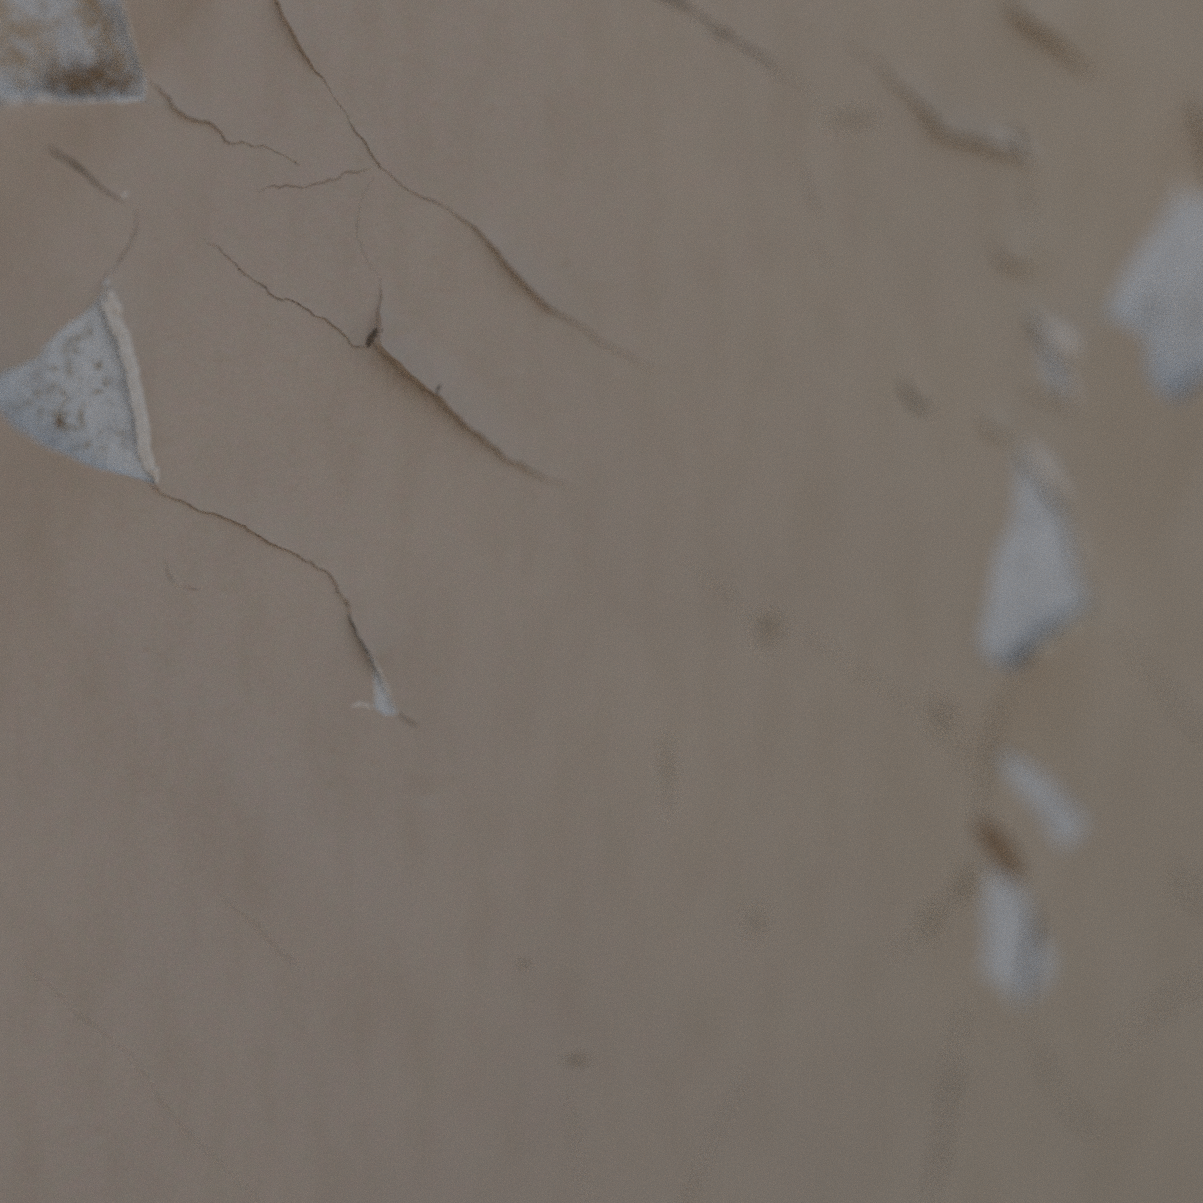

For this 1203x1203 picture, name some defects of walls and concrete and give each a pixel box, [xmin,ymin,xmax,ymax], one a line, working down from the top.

peeling [0,0,220,297]
crack [147,72,297,164]
crack [276,0,659,369]
peeling [1025,296,1079,414]
peeling [0,264,186,697]
crack [146,475,360,614]
peeling [981,855,1062,1008]